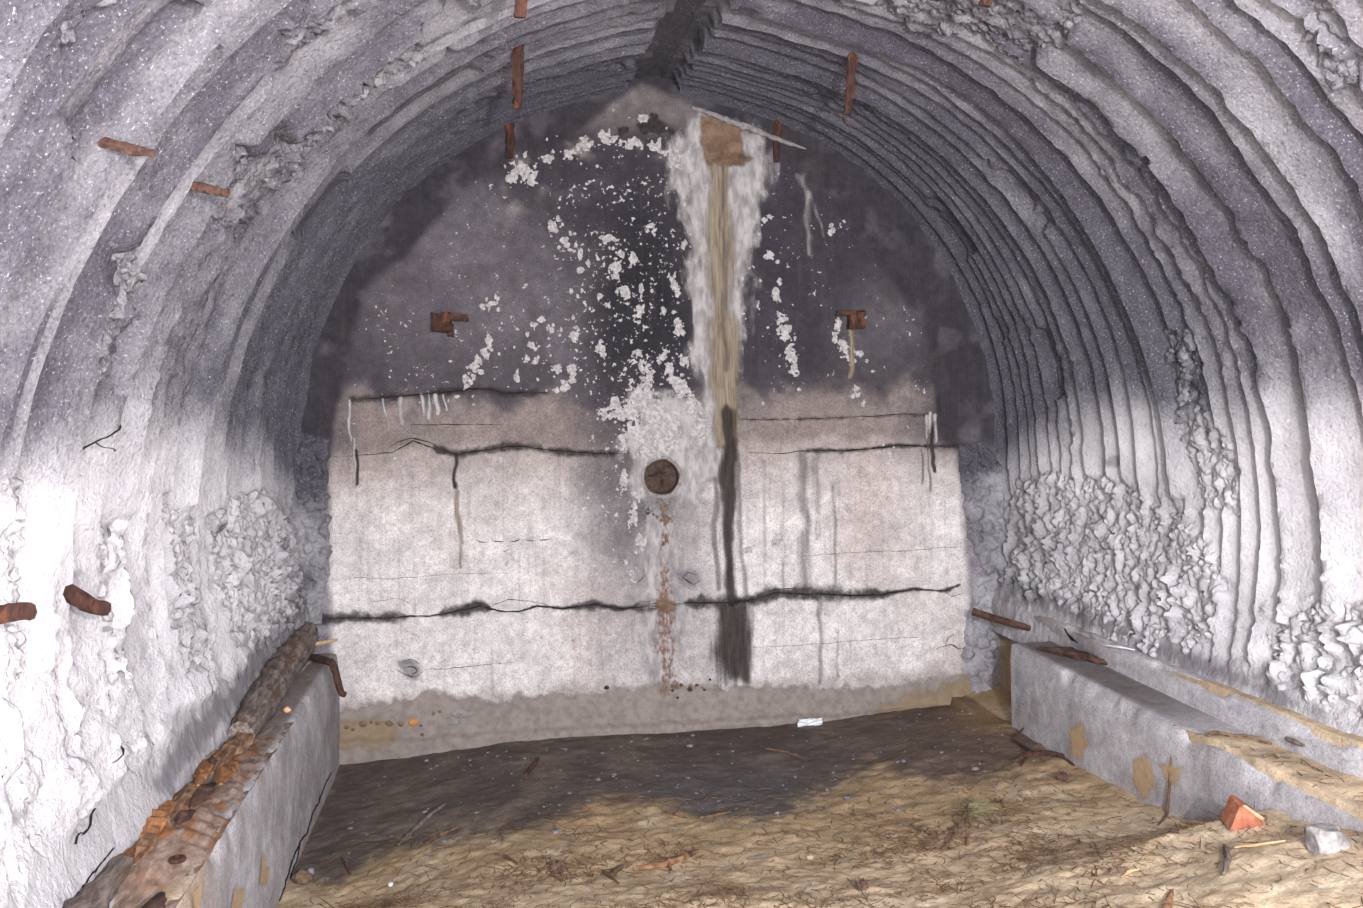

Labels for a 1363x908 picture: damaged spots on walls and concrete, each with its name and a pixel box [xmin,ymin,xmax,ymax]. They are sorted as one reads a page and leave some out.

spalling [356,43,422,100]
spalling [212,115,342,229]
crack [80,424,122,476]
crack [336,388,625,458]
leakage [339,112,973,765]
crack [744,413,955,454]
spalling [1163,326,1241,516]
spalling [162,429,333,674]
crack [314,538,962,625]
rust [656,569,702,689]
spalling [958,441,1231,694]
spalling [1266,602,1363,723]